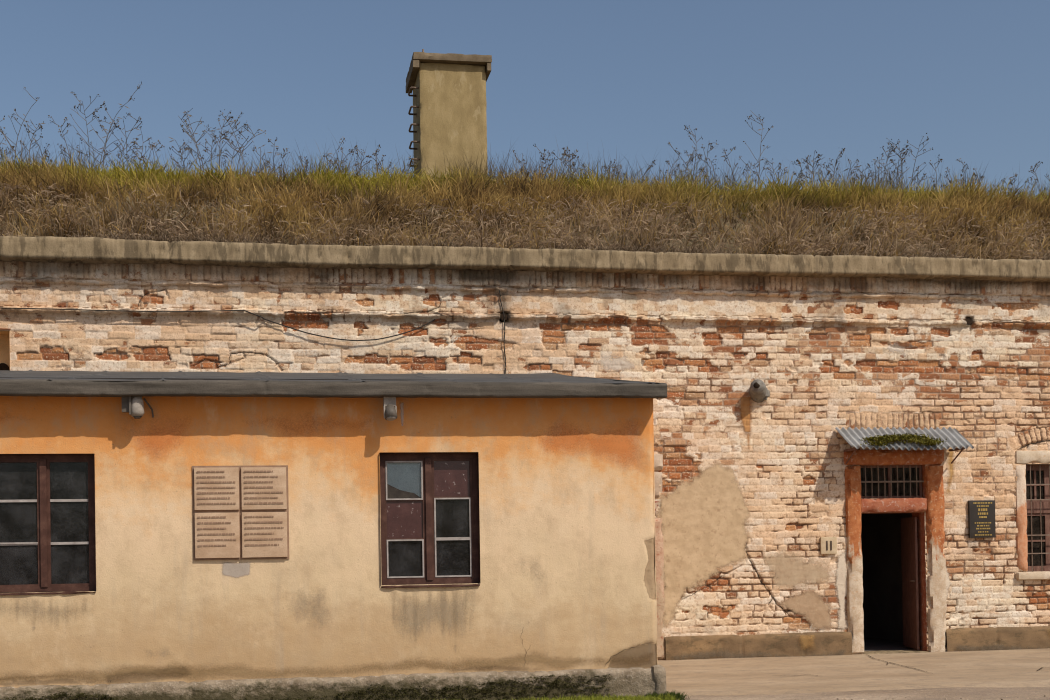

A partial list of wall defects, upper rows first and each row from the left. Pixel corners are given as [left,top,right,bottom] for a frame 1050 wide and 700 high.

peeling [644,538,656,599]
flaking render [680,573,729,613]
flaking render [703,605,735,619]
crack [682,543,791,616]